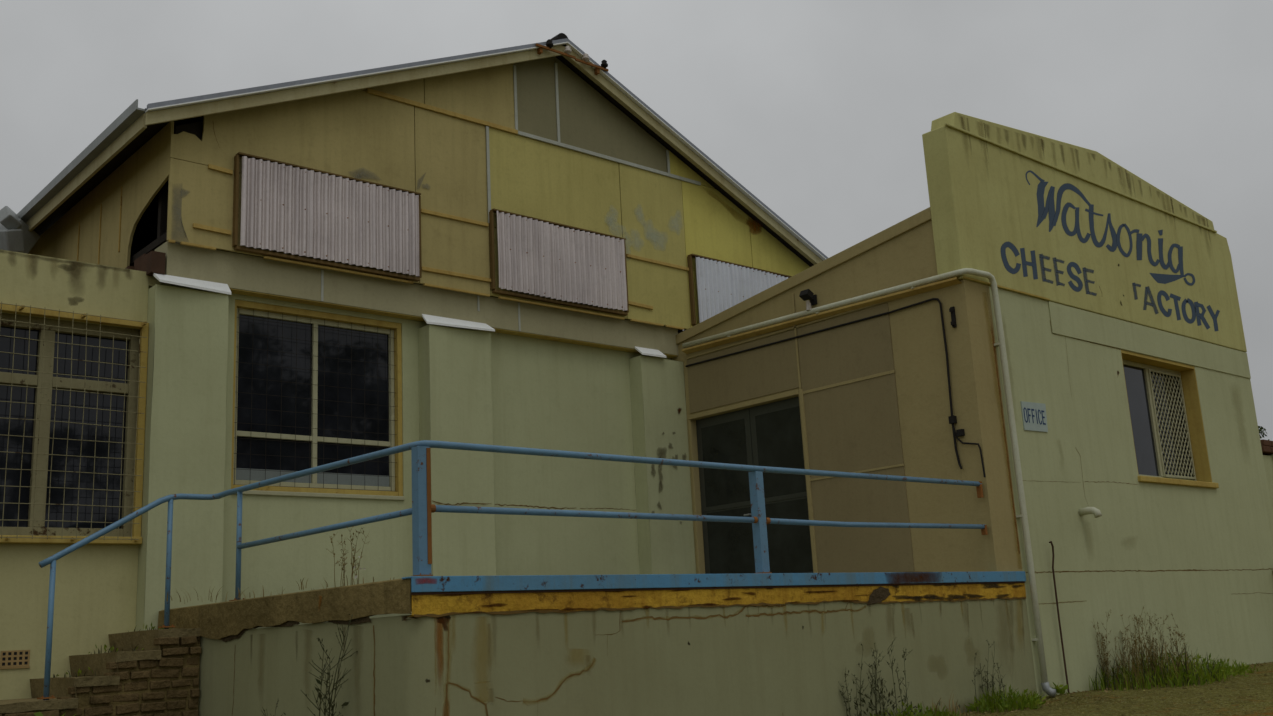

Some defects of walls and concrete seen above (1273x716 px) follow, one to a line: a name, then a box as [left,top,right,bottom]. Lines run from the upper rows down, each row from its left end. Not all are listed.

crack [433,501,629,510]
spalling [867,583,1022,605]
spalling [433,615,450,630]
crack [435,602,866,716]